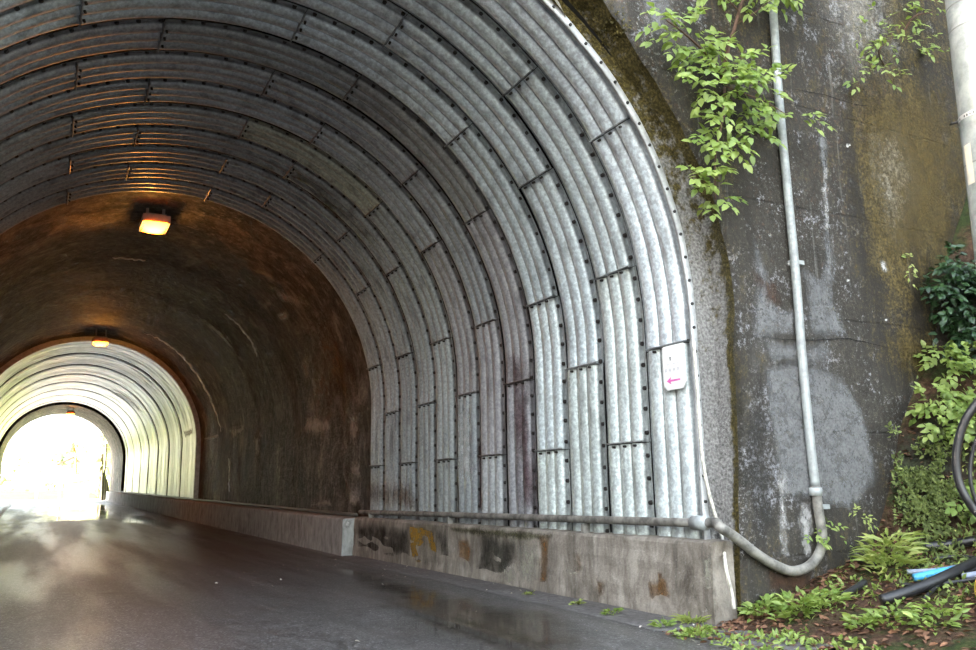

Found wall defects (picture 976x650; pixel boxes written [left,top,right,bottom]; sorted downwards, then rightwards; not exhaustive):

water stain [819,136,828,228]
water stain [748,240,874,555]